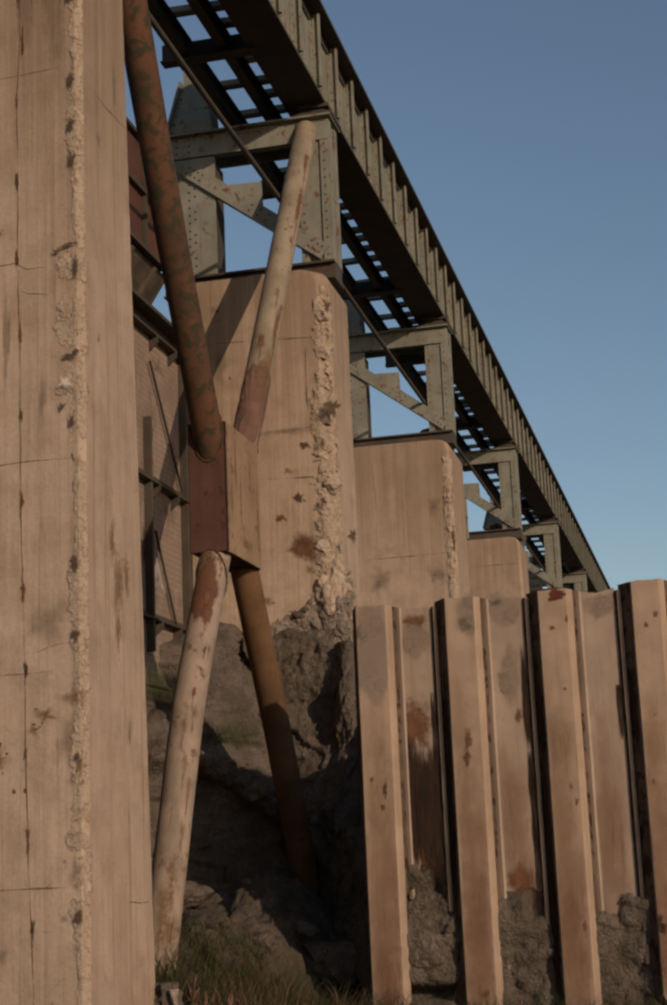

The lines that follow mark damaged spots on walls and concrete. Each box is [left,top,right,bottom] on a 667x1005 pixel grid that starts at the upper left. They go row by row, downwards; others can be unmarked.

crack [0,188,48,320]
crack [0,404,65,578]
spalling [53,0,93,1005]
rust [289,536,317,571]
spalling [270,285,357,643]
crack [1,648,55,1005]